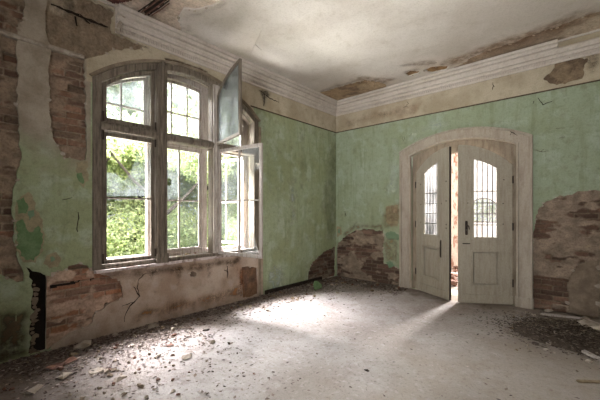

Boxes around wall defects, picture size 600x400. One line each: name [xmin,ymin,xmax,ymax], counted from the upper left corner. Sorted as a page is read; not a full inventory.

crack [51,3,108,27]
flaking render [45,0,219,188]
spalling [320,80,386,101]
spalling [406,12,600,76]
spalling [544,57,590,85]
flaking render [0,0,122,353]
crack [123,273,146,322]
flaking render [242,266,258,298]
flaking render [308,204,399,285]
flaking render [533,190,600,319]